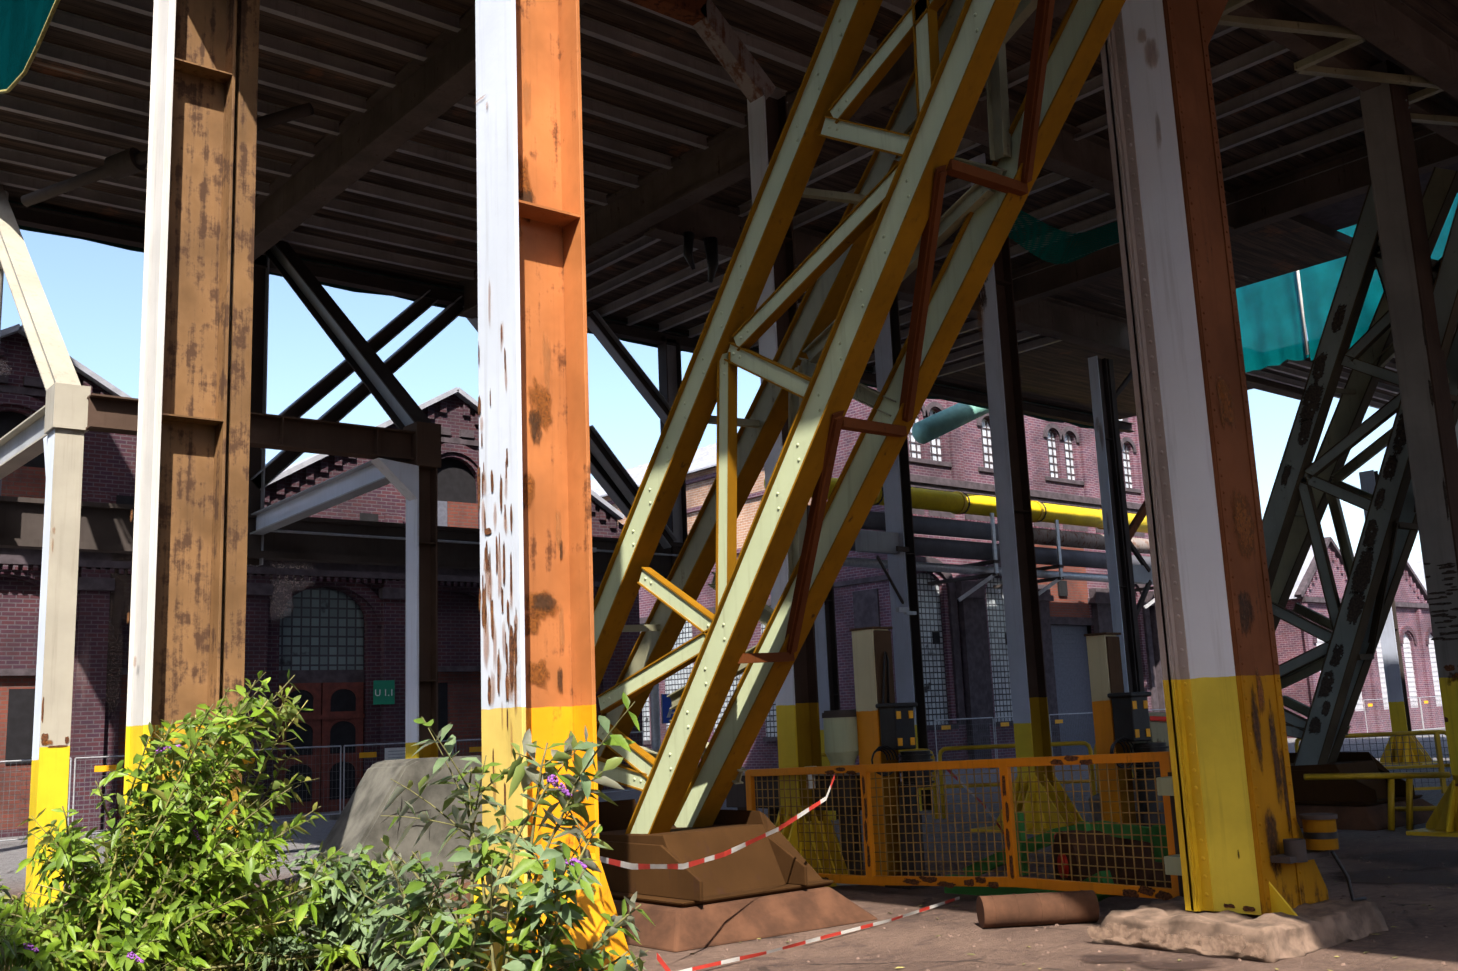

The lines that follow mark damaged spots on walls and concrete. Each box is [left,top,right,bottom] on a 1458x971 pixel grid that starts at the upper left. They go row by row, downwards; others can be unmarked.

rust [523,474,534,509]
rust [525,591,558,636]
rust [528,660,563,692]